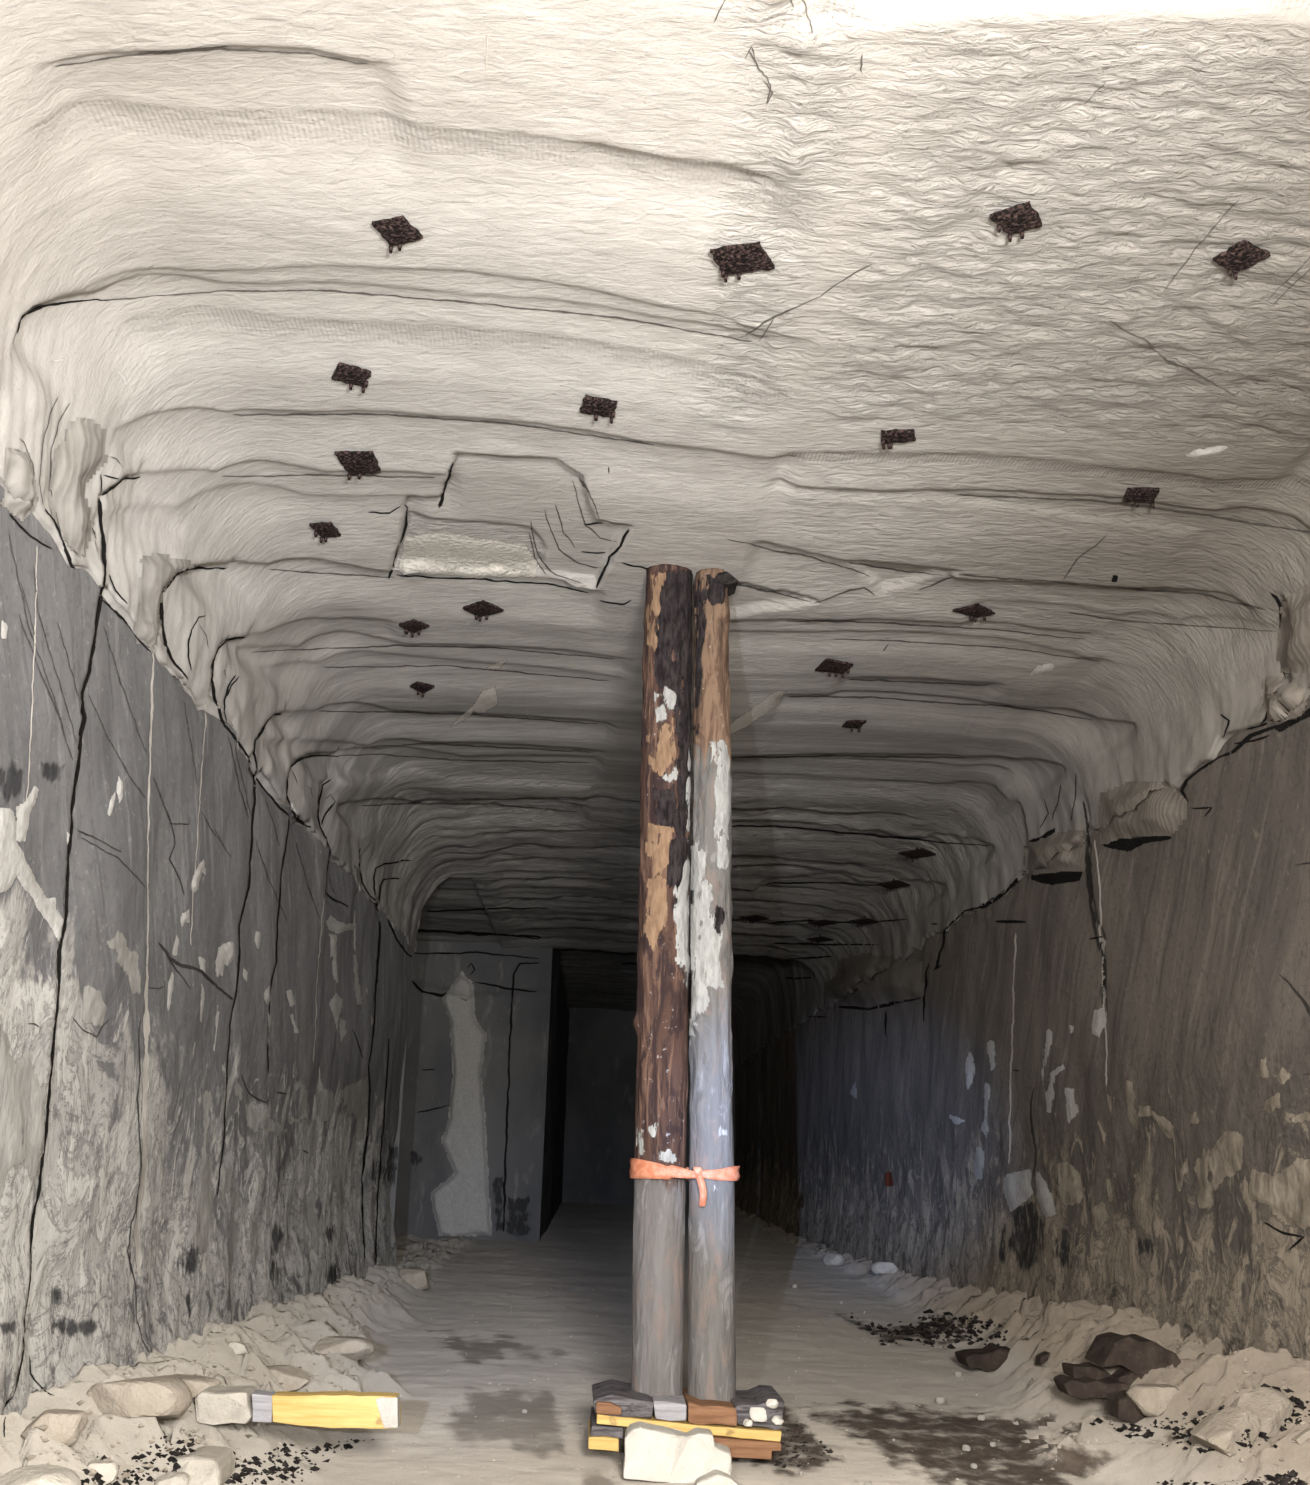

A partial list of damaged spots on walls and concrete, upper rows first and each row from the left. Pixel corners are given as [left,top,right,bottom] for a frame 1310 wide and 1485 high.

crack [746,46,774,102]
spalling [398,533,537,578]
crack [1271,593,1283,628]
crack [1180,712,1293,817]
crack [2,475,539,1437]
crack [1280,975,1310,1015]
crack [1264,1222,1304,1250]